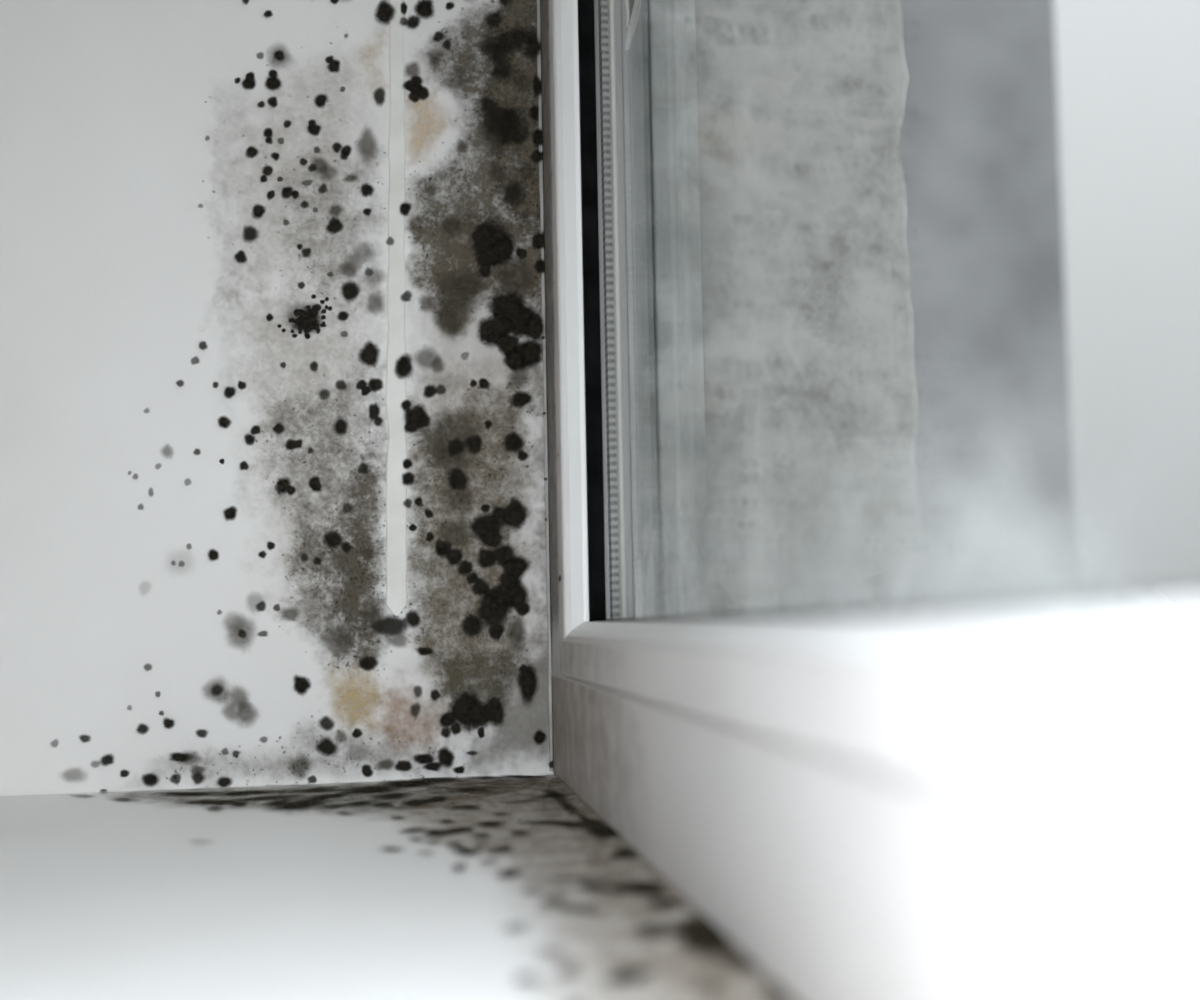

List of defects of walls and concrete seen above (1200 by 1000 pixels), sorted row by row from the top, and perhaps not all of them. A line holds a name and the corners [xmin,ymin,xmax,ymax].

leakage [101,0,789,1000]